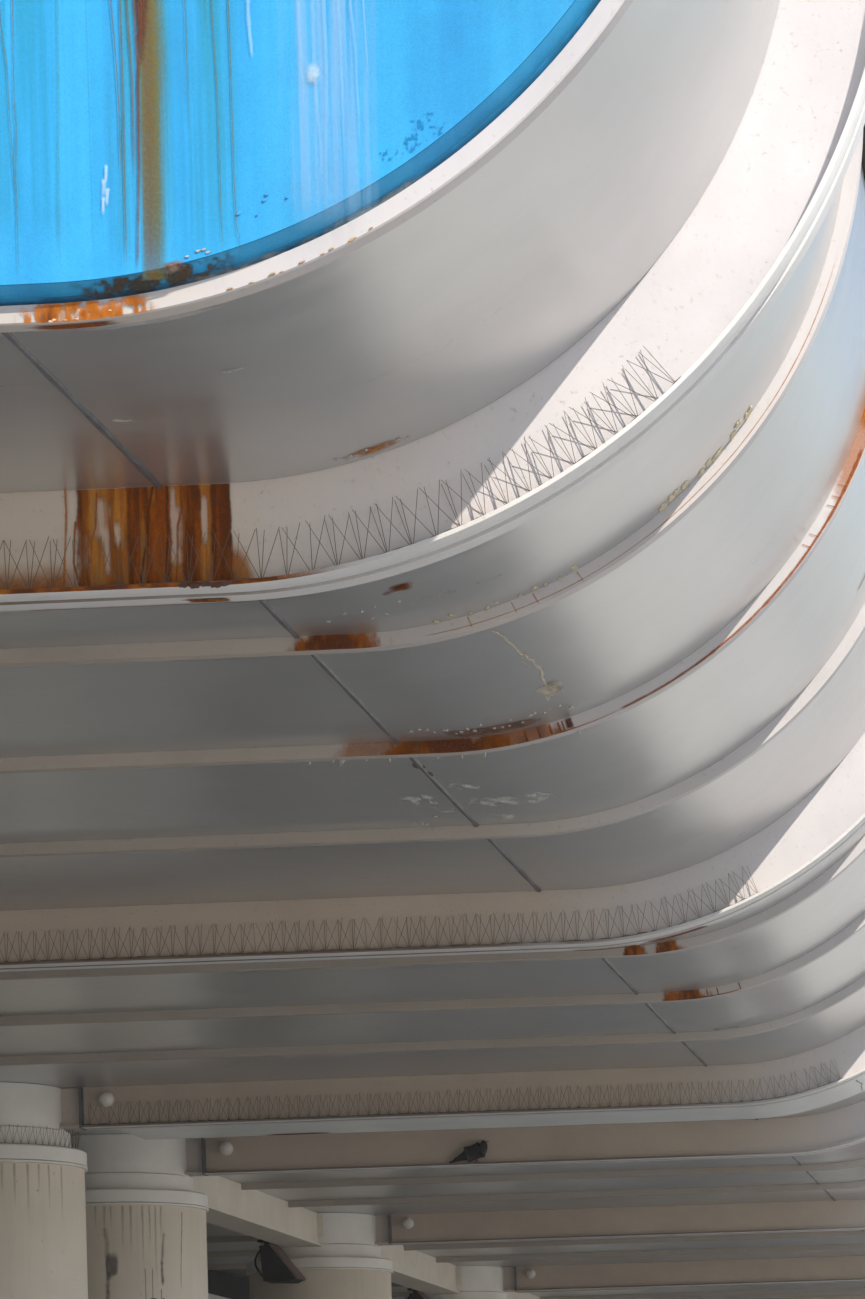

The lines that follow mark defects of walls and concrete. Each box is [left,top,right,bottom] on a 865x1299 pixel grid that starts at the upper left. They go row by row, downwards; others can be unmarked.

rust [24,0,220,330]
rust [211,0,237,229]
peeling [379,113,445,160]
rust [333,436,410,461]
rust [0,483,305,605]
rust [294,633,377,651]
rust [386,409,865,755]